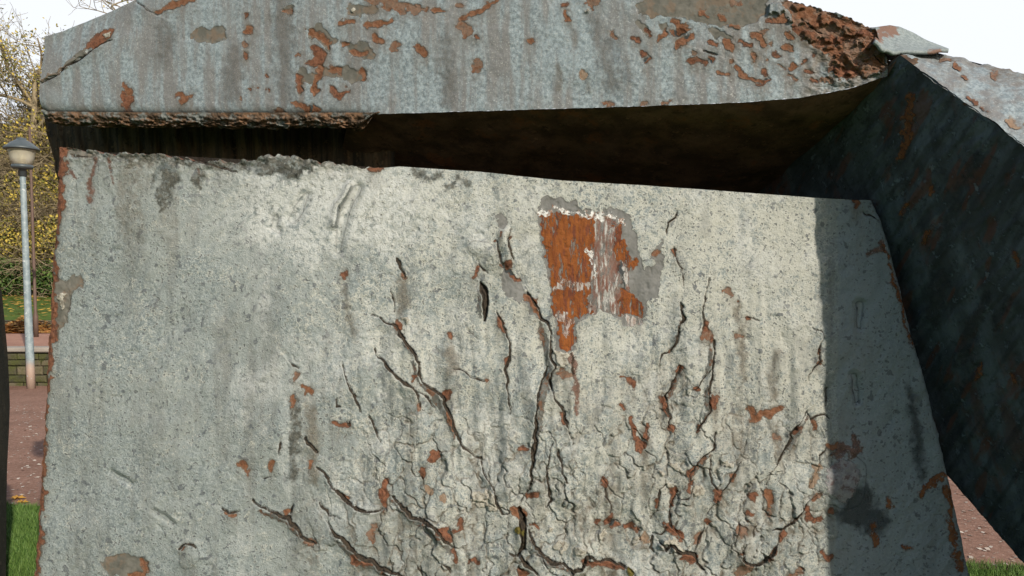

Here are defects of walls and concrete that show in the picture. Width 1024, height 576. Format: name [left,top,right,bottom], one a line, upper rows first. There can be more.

rust [41,12,428,132]
rust [430,0,499,40]
rust [471,58,483,73]
peeling [499,195,665,368]
rust [34,147,114,576]
crack [291,363,300,382]
crack [222,437,470,576]
crack [332,365,381,443]
crack [372,230,635,576]
crack [594,212,746,571]
crack [734,329,829,576]